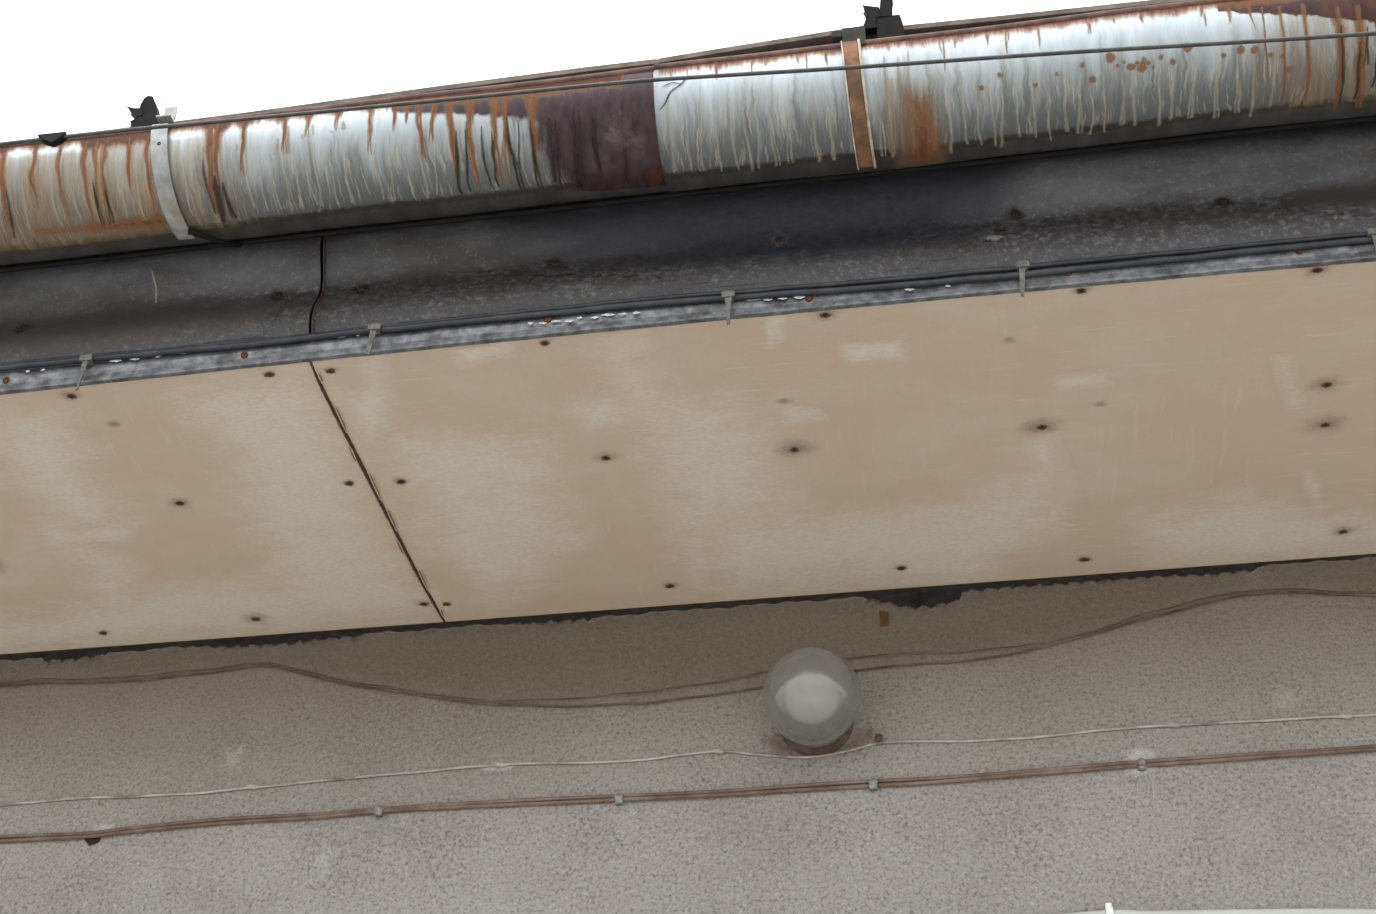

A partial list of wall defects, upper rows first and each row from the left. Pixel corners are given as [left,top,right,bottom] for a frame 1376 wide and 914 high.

corrosion [0,132,169,247]
corrosion [168,112,343,222]
corrosion [361,48,842,195]
corrosion [861,0,1376,163]